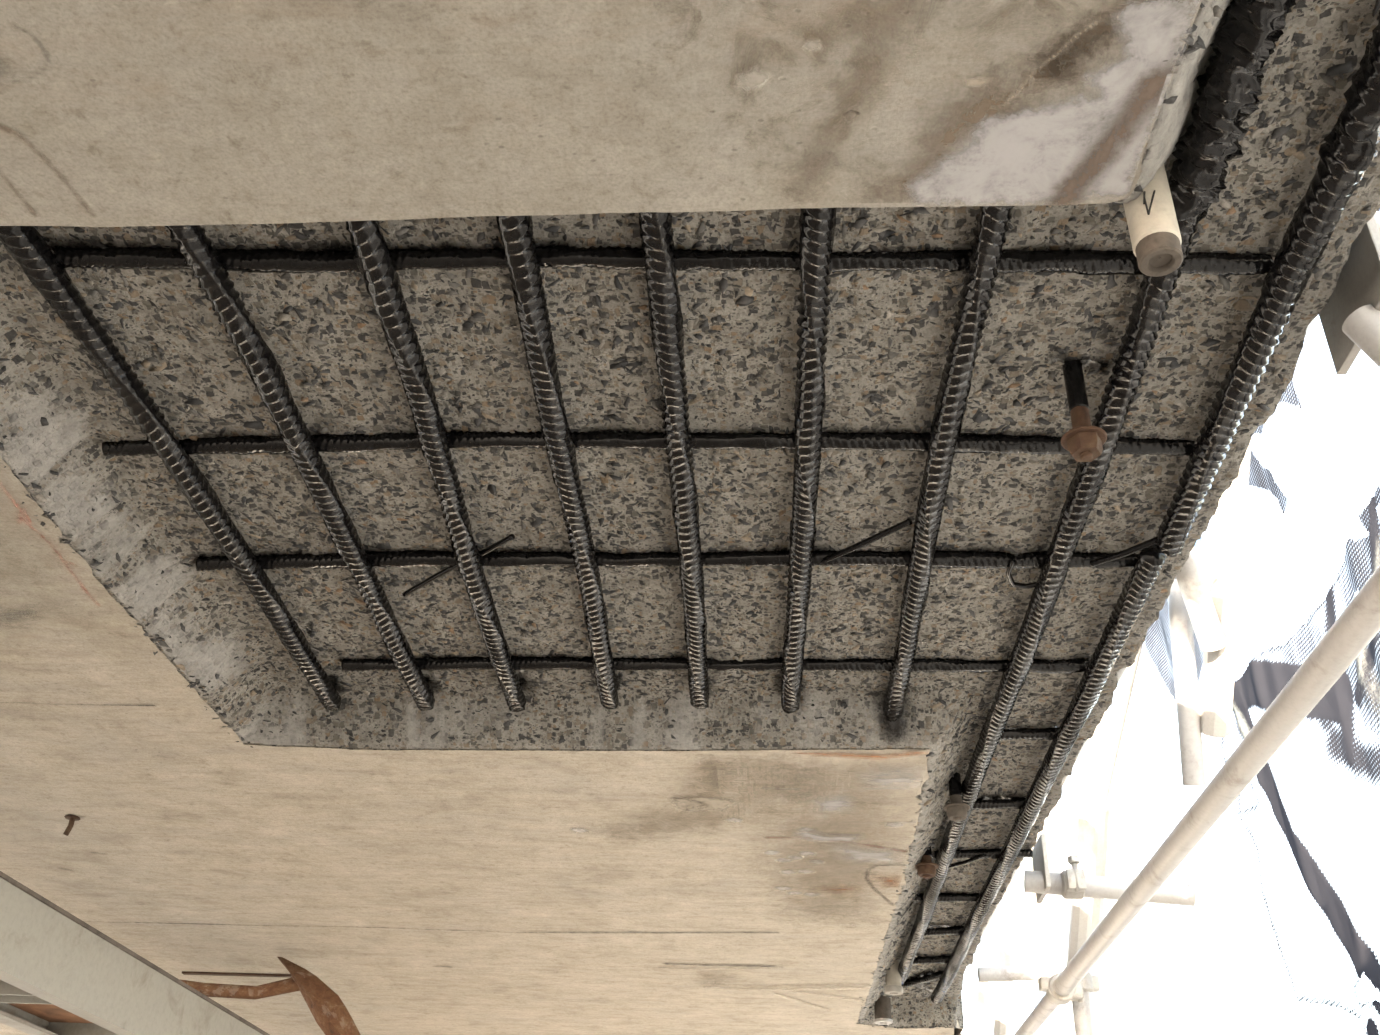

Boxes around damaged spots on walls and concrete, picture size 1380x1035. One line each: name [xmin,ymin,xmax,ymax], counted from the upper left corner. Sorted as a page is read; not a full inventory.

water stain [869,0,1199,206]
spalling [1002,0,1232,251]
spalling [1188,0,1380,261]
spalling [200,221,353,251]
spalling [378,216,503,250]
spalling [532,213,642,248]
spalling [671,208,800,252]
spalling [832,206,989,253]
spalling [960,272,1143,437]
spalling [935,453,1078,554]
spalling [1005,141,1380,849]
spalling [0,240,1052,1029]